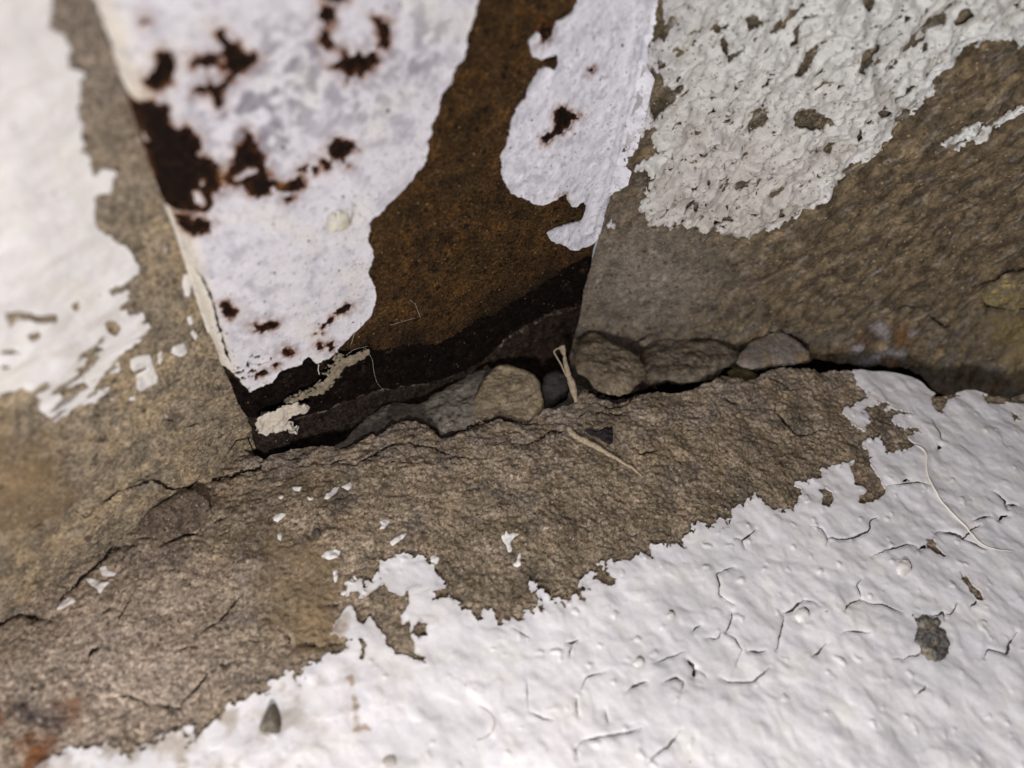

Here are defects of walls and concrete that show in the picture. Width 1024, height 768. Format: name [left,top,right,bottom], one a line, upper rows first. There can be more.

corrosion [189,28,259,111]
spalling [851,1,974,80]
corrosion [125,49,360,237]
corrosion [223,0,595,460]
peeling [569,39,1024,413]
peeling [0,0,256,620]
corrosion [219,299,239,321]
crack [290,330,944,465]
crack [0,518,225,626]
peeling [0,367,921,768]
crack [628,568,814,691]
crack [813,493,1017,555]